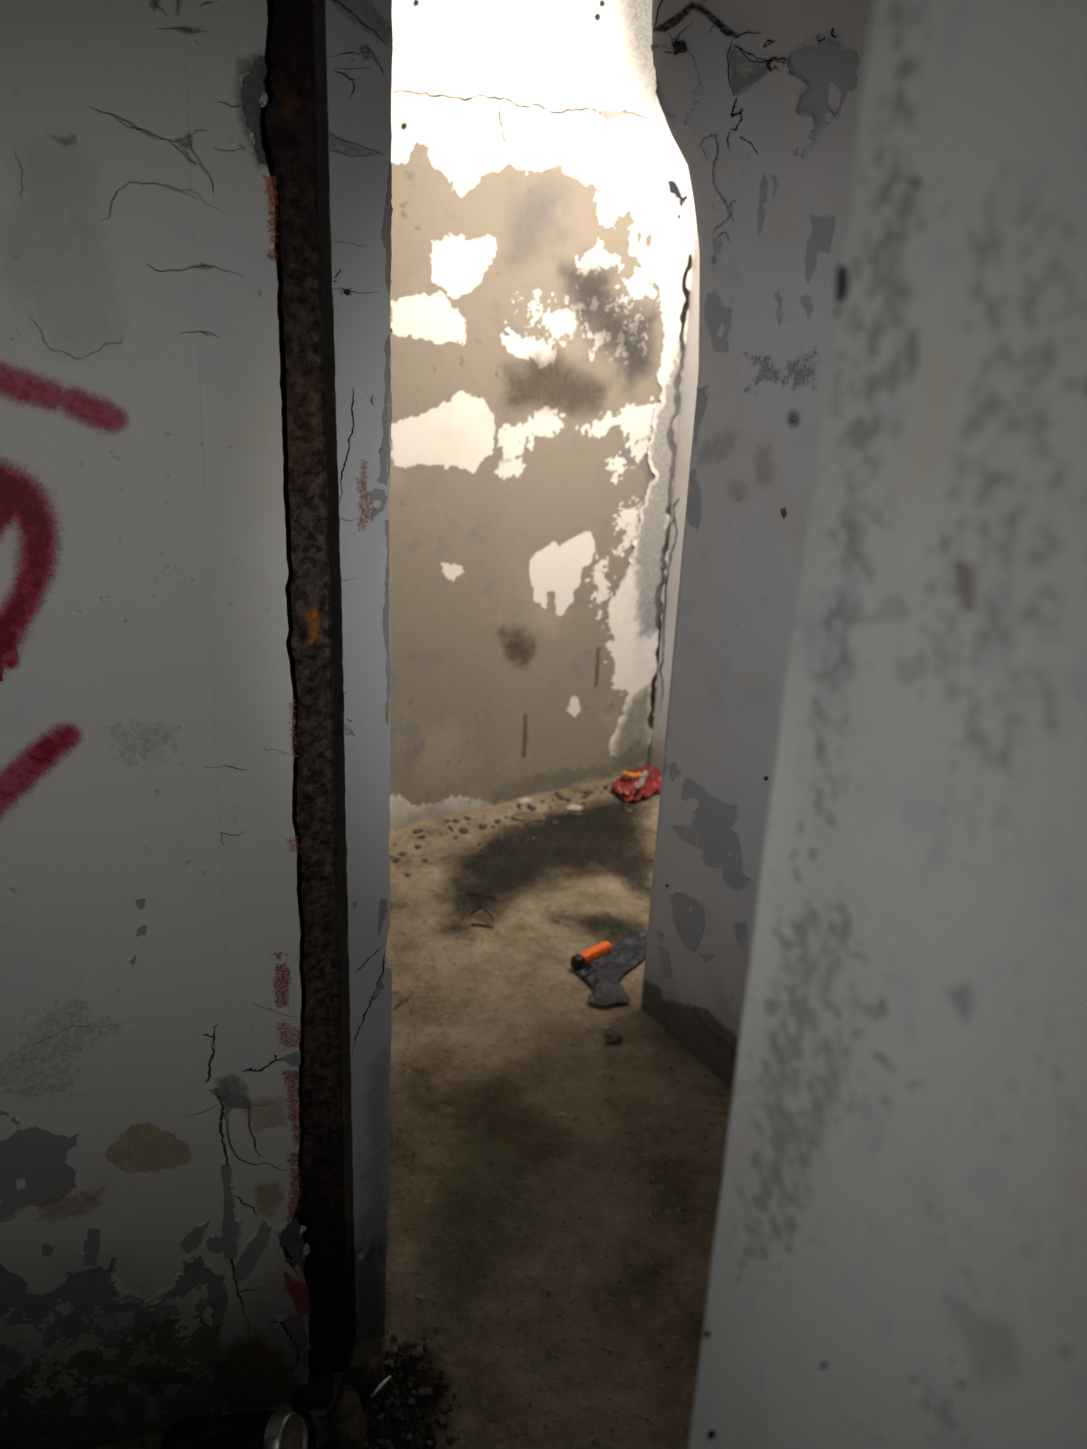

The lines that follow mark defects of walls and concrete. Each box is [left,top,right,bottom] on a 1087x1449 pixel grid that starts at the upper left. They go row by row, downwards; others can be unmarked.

crack [393,90,651,148]
crack [733,46,787,73]
peeling [726,29,859,159]
rust [262,176,278,259]
peeling [368,141,670,806]
crack [647,98,760,766]
peeling [662,757,753,892]
peeling [656,889,714,979]
peeling [0,1110,79,1222]
crack [203,1003,300,1216]
peeling [0,1165,310,1449]
crack [229,1259,300,1372]